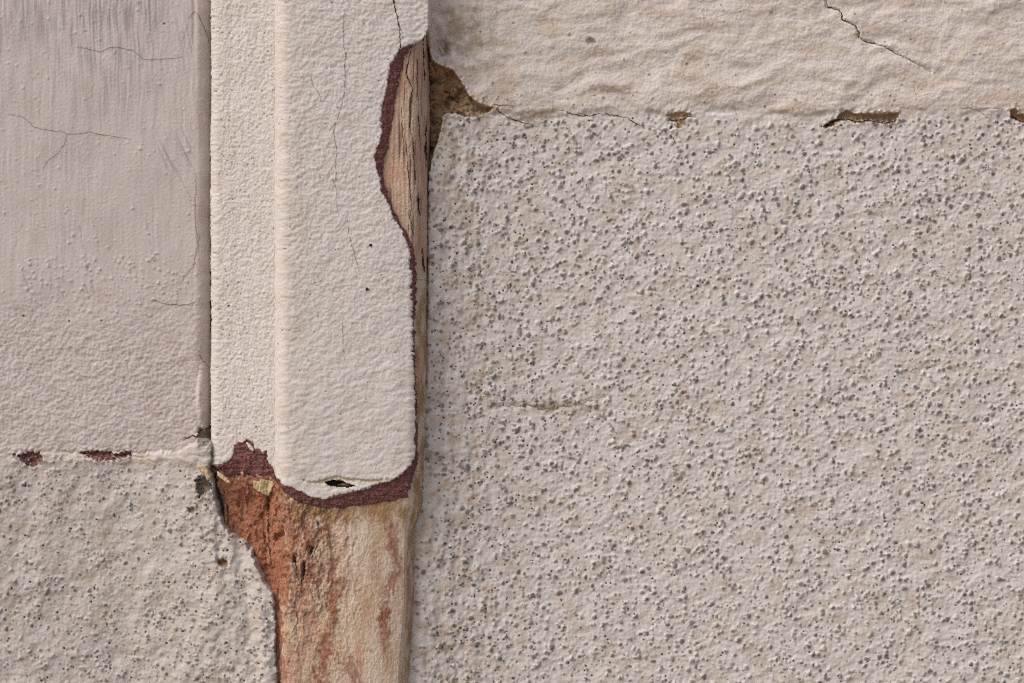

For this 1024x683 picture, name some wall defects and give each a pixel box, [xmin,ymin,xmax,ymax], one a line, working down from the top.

crack [826,1,922,66]
spalling [666,112,692,129]
spalling [822,110,899,129]
spalling [1010,108,1024,122]
crack [12,114,131,168]
spalling [187,35,493,514]
spalling [12,451,43,467]
spalling [79,450,132,462]